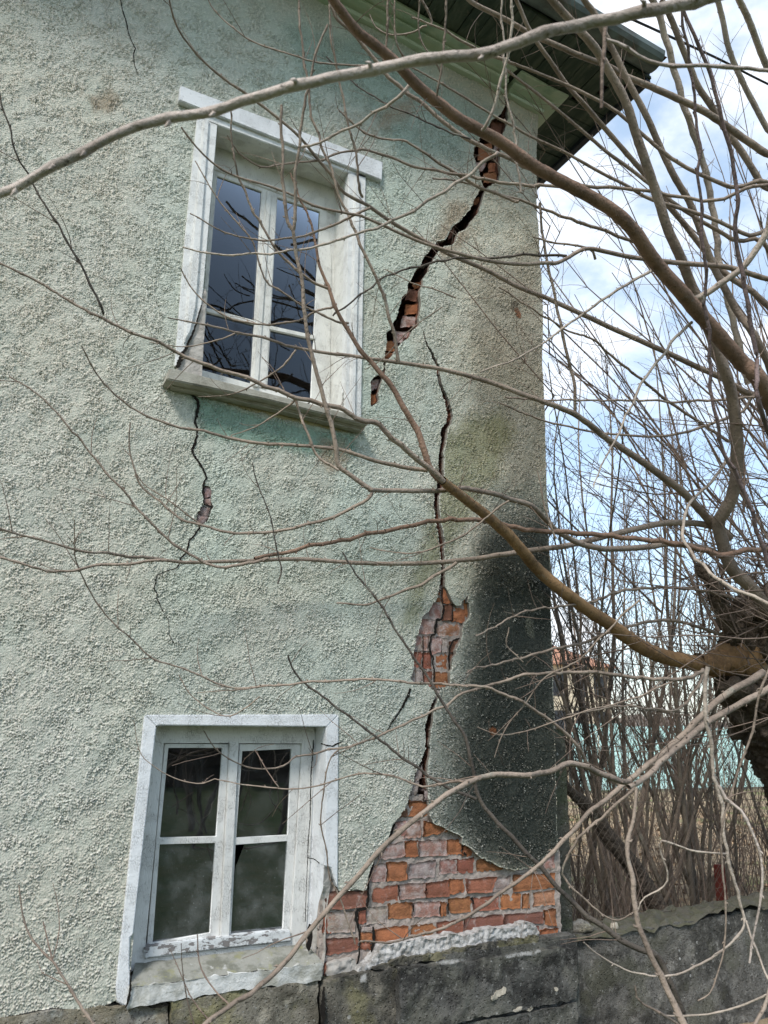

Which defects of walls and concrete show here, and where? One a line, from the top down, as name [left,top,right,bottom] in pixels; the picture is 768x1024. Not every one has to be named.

crack [370,100,507,406]
crack [431,356,452,591]
crack [153,527,201,643]
crack [386,688,440,803]
spalling [410,586,468,689]
water stain [441,491,557,867]
spalling [306,794,562,976]